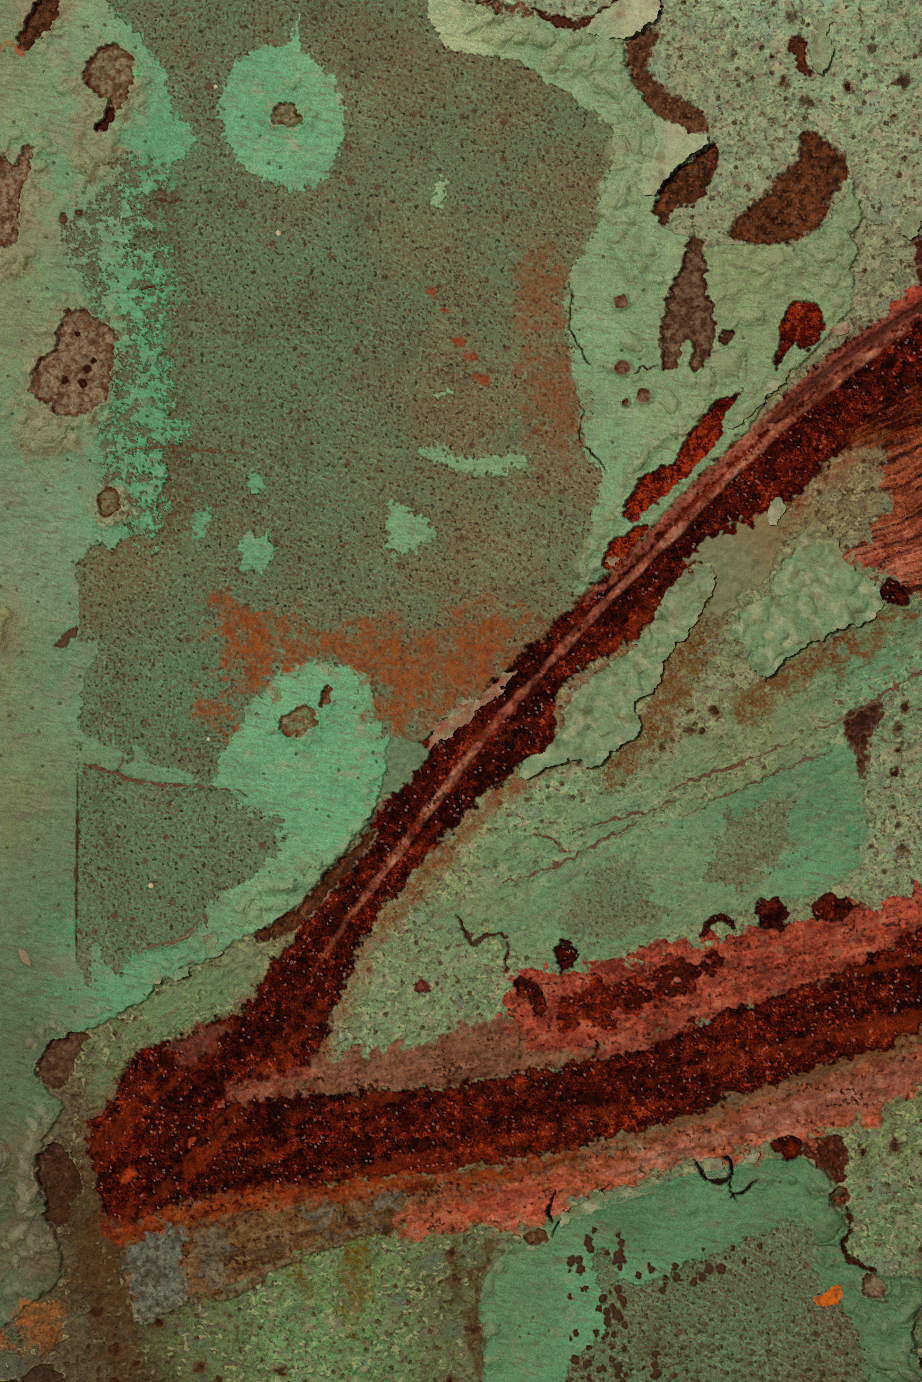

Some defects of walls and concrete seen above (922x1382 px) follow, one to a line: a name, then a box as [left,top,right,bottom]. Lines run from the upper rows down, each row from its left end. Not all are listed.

peeling [60,0,884,985]
corrosion [84,205,922,1380]
crack [454,914,511,978]
crack [692,1152,760,1201]
corrosion [0,1297,72,1360]